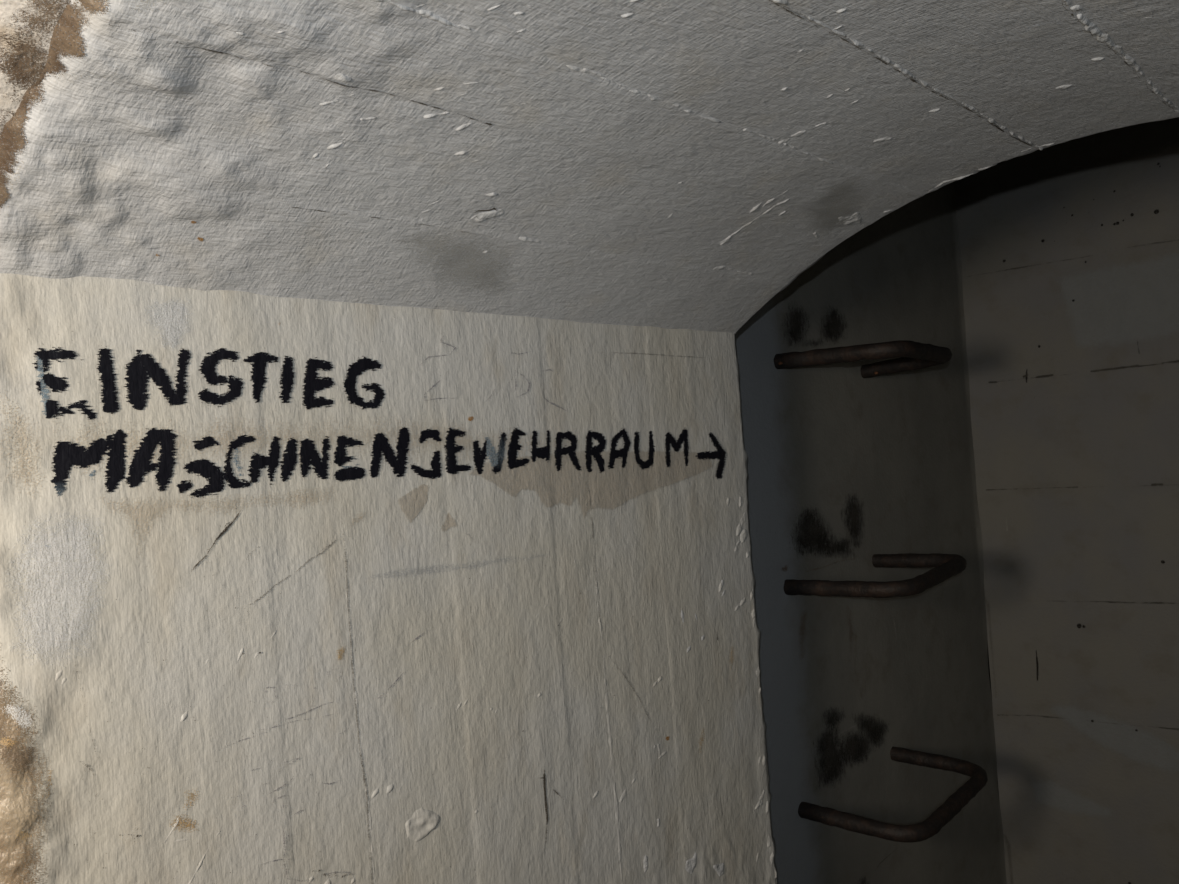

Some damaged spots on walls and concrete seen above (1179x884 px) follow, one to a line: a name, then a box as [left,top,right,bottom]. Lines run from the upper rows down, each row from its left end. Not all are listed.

damp [0,0,109,215]